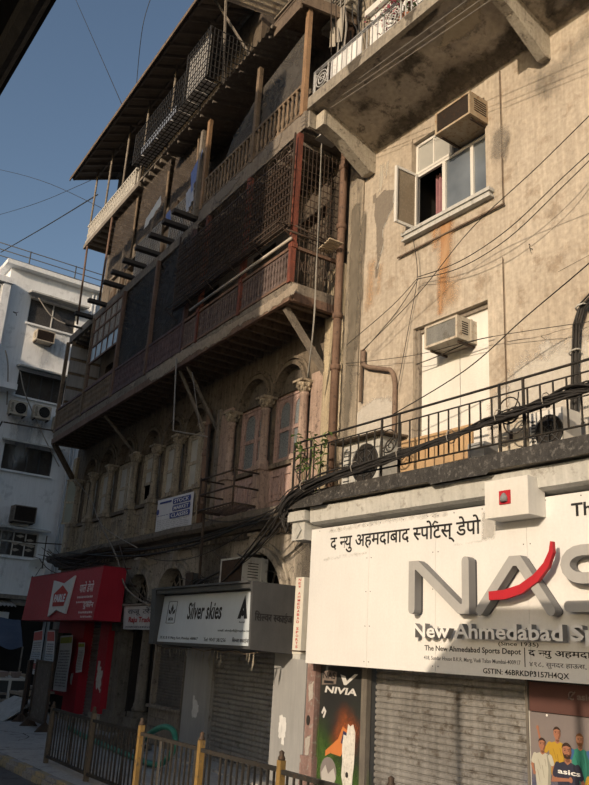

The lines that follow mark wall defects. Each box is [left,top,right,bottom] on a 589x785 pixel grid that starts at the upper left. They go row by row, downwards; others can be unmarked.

water stain [544,0,589,26]
water stain [348,54,361,73]
water stain [377,27,527,146]
water stain [493,128,509,157]
rust [433,220,451,313]